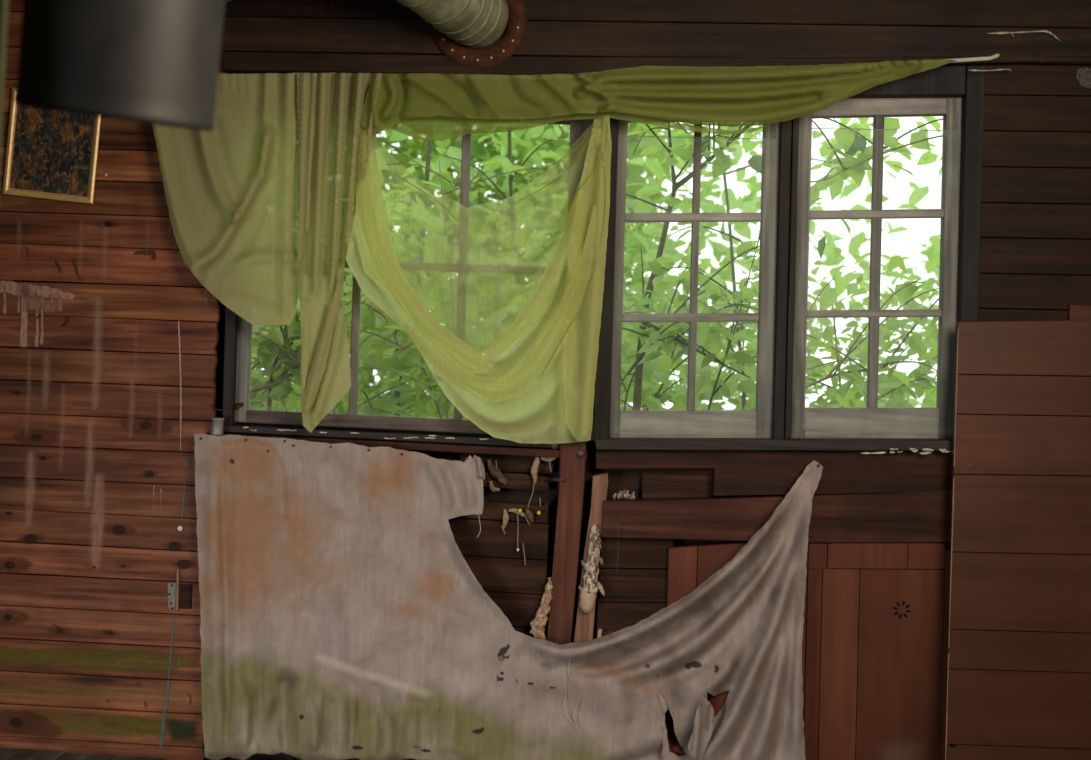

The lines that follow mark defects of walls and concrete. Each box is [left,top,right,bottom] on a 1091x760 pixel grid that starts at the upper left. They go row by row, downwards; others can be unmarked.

spalling [530,577,553,640]